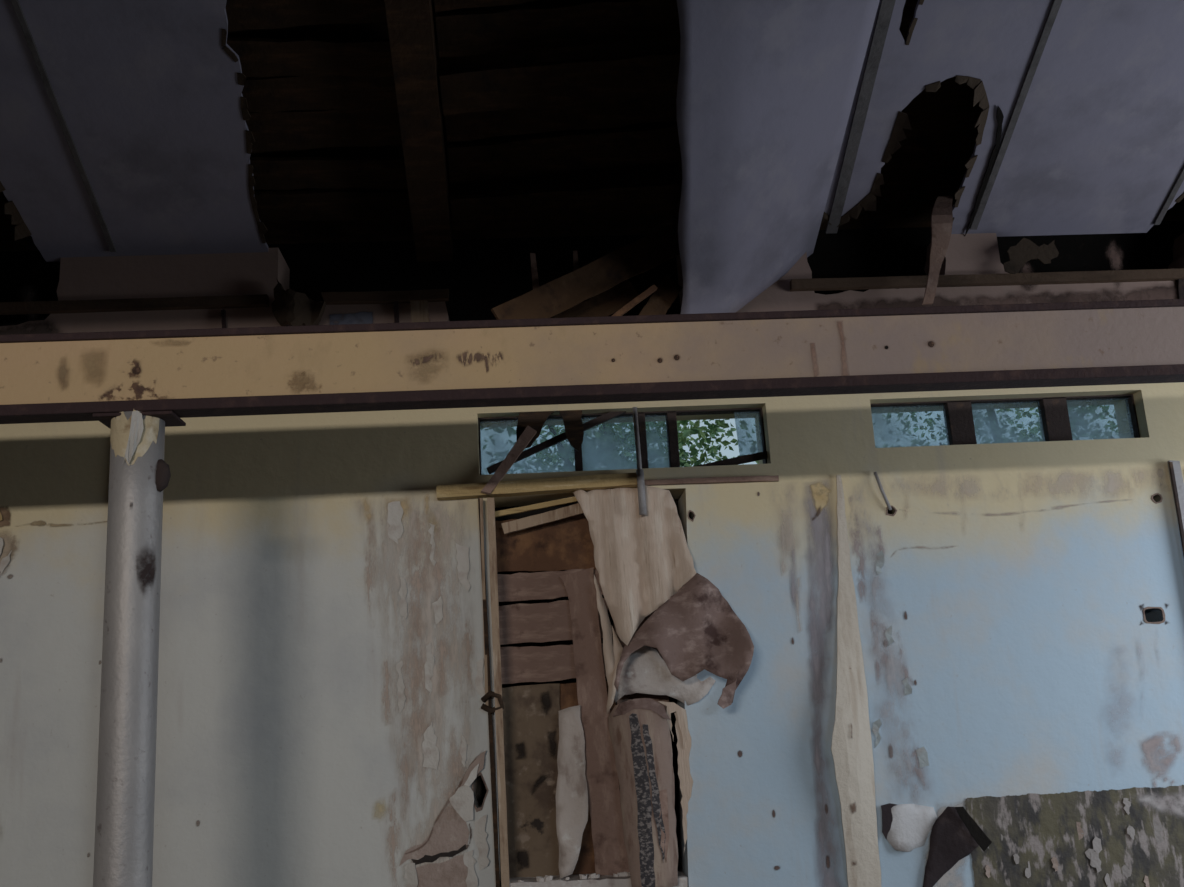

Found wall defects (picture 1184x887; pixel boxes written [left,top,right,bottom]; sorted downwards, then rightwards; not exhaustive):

peeling [925,81,941,92]
peeling [820,111,912,227]
peeling [953,75,989,221]
corrosion [101,361,166,400]
peeling [110,410,160,466]
flaking render [0,507,17,579]
leakage [782,498,831,703]
flaking render [399,751,490,887]
leakage [933,857,965,887]
peeling [923,785,1184,887]